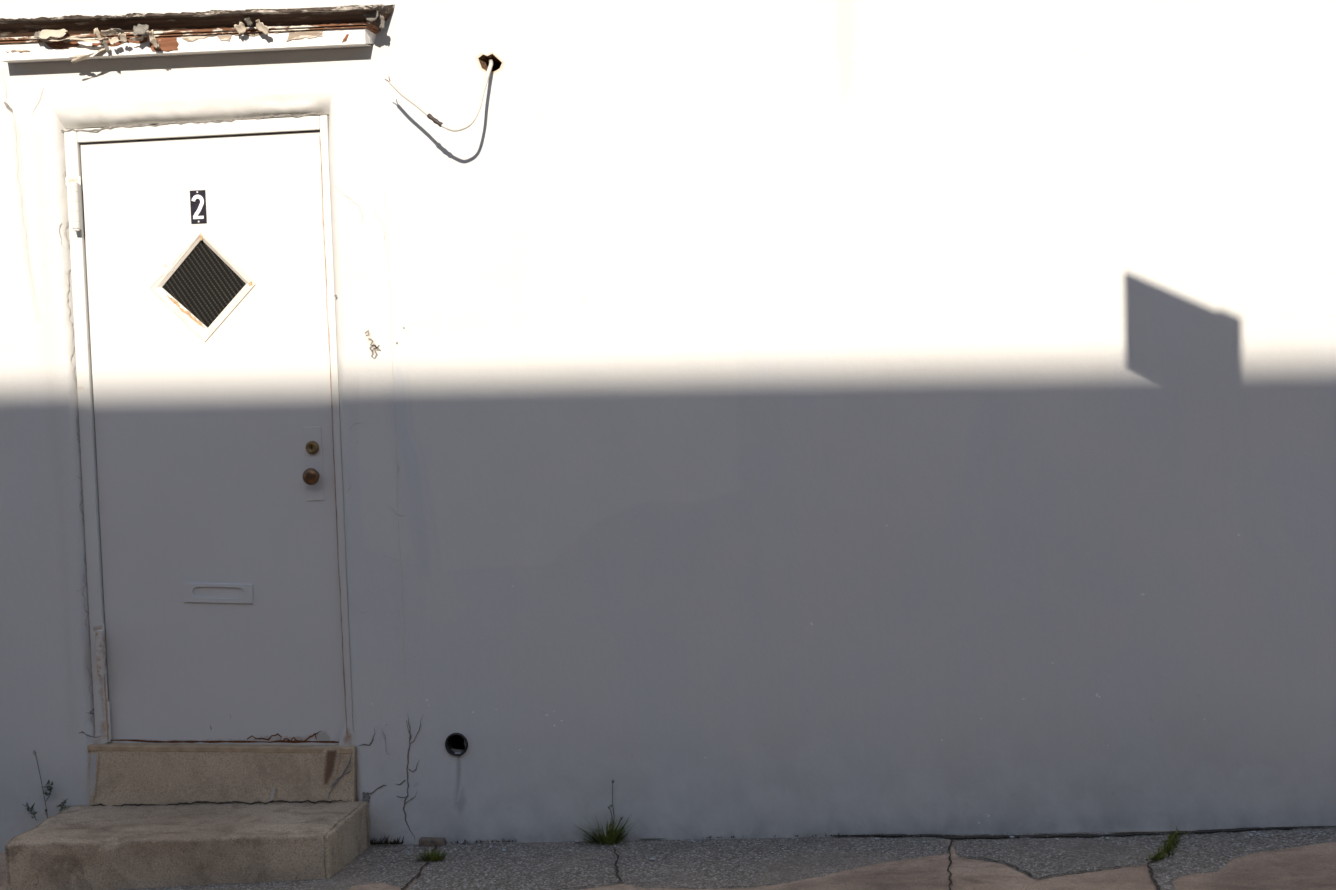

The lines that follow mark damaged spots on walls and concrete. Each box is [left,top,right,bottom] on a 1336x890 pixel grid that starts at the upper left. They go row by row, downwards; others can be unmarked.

peeling [6,16,323,63]
peeling [363,6,385,30]